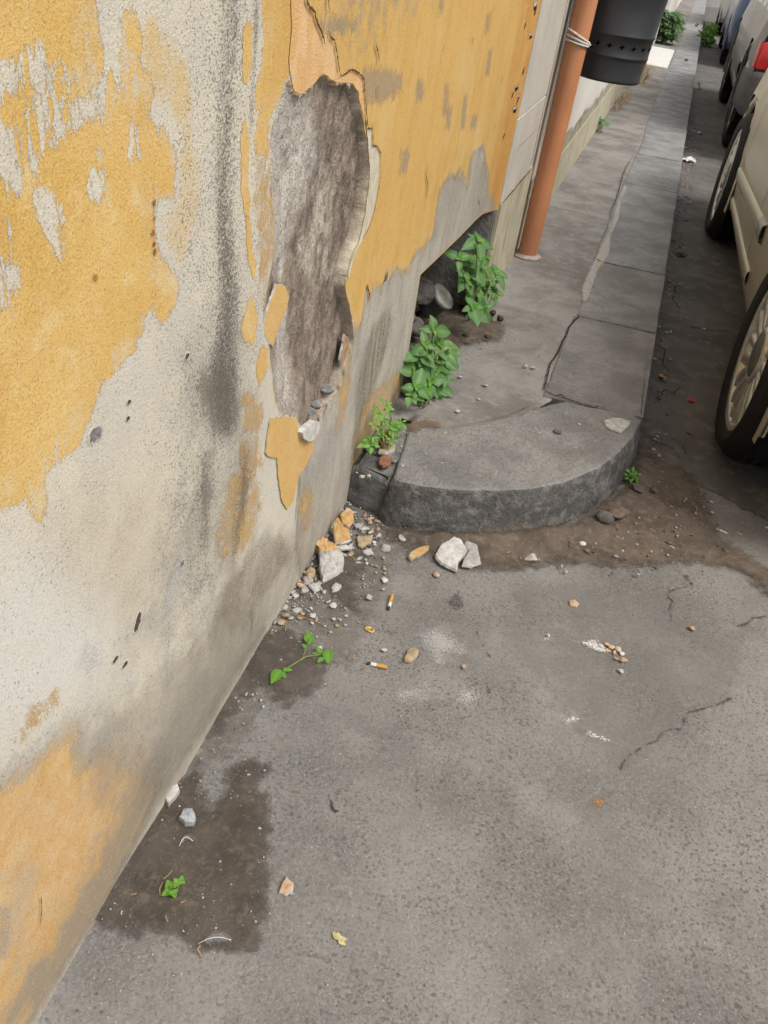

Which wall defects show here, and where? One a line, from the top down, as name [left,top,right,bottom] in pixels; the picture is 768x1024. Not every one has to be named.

leakage [95,758,273,952]
peeling [0,0,495,904]